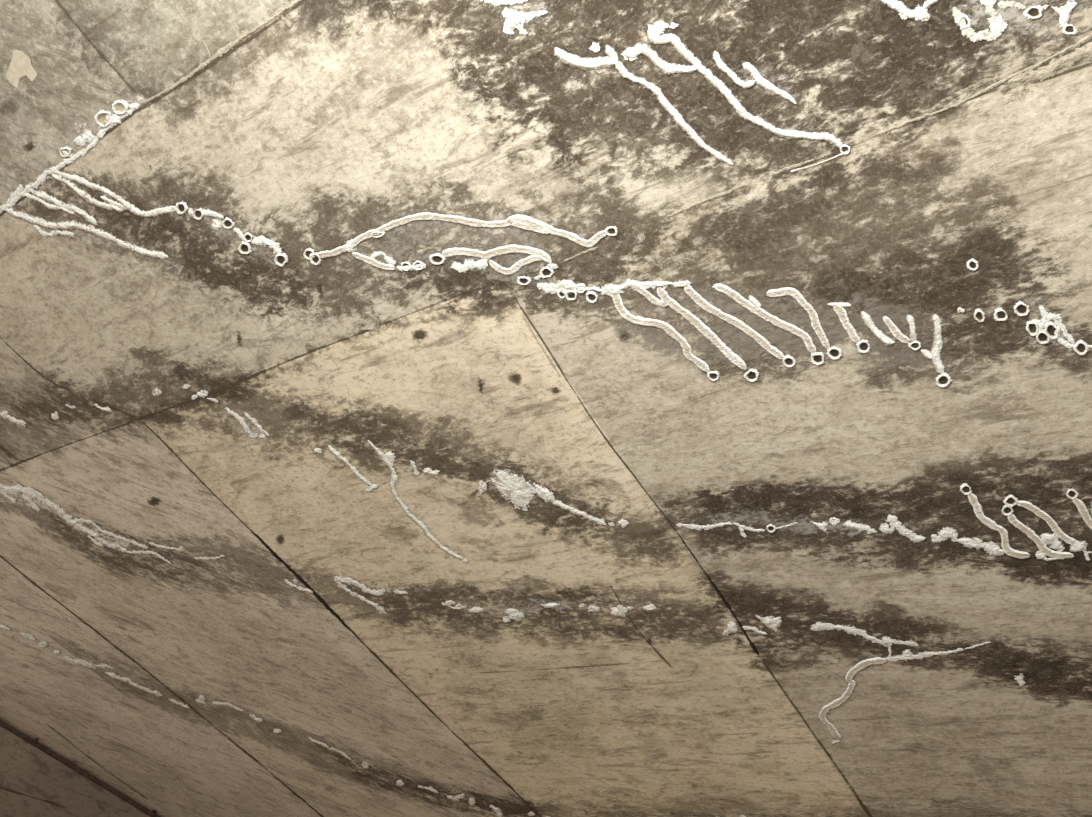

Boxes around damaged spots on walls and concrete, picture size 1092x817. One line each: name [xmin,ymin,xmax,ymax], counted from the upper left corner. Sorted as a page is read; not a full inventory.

water stain [0,0,1092,393]
water stain [0,346,1092,585]
water stain [285,579,313,593]
water stain [333,575,408,614]
water stain [0,624,262,722]
water stain [697,571,1092,744]
water stain [308,737,369,769]